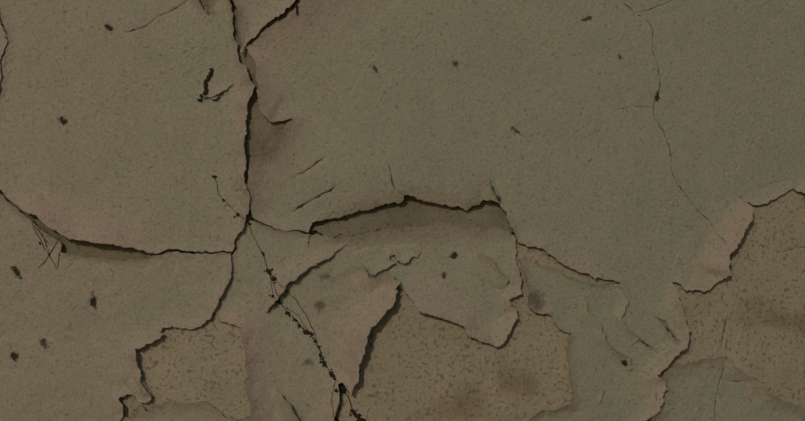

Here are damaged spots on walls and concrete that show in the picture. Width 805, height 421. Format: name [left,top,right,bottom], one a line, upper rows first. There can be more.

crack [0,13,8,94]
peeling [232,0,300,53]
crack [622,0,726,244]
crack [0,190,226,261]
peeling [103,303,251,420]
peeling [234,221,345,312]
peeling [283,244,573,421]
peeling [657,178,805,409]